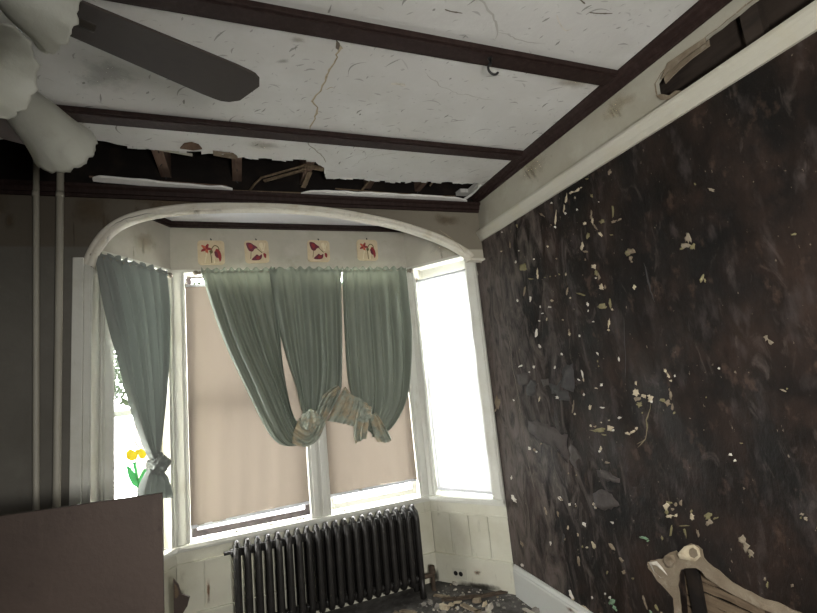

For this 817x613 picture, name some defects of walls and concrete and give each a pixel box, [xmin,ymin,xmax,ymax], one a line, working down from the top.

crack [479,0,539,44]
crack [307,45,343,162]
peeling [590,417,622,436]